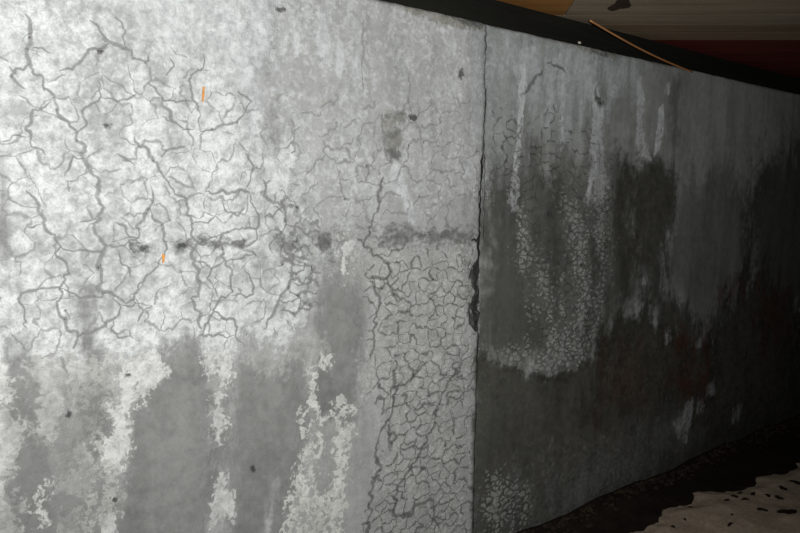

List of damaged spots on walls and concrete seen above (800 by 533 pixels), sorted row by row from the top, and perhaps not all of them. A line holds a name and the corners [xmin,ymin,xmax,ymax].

crack [10,17,330,348]
water stain [0,0,628,533]
crack [471,25,487,528]
water stain [356,58,800,533]